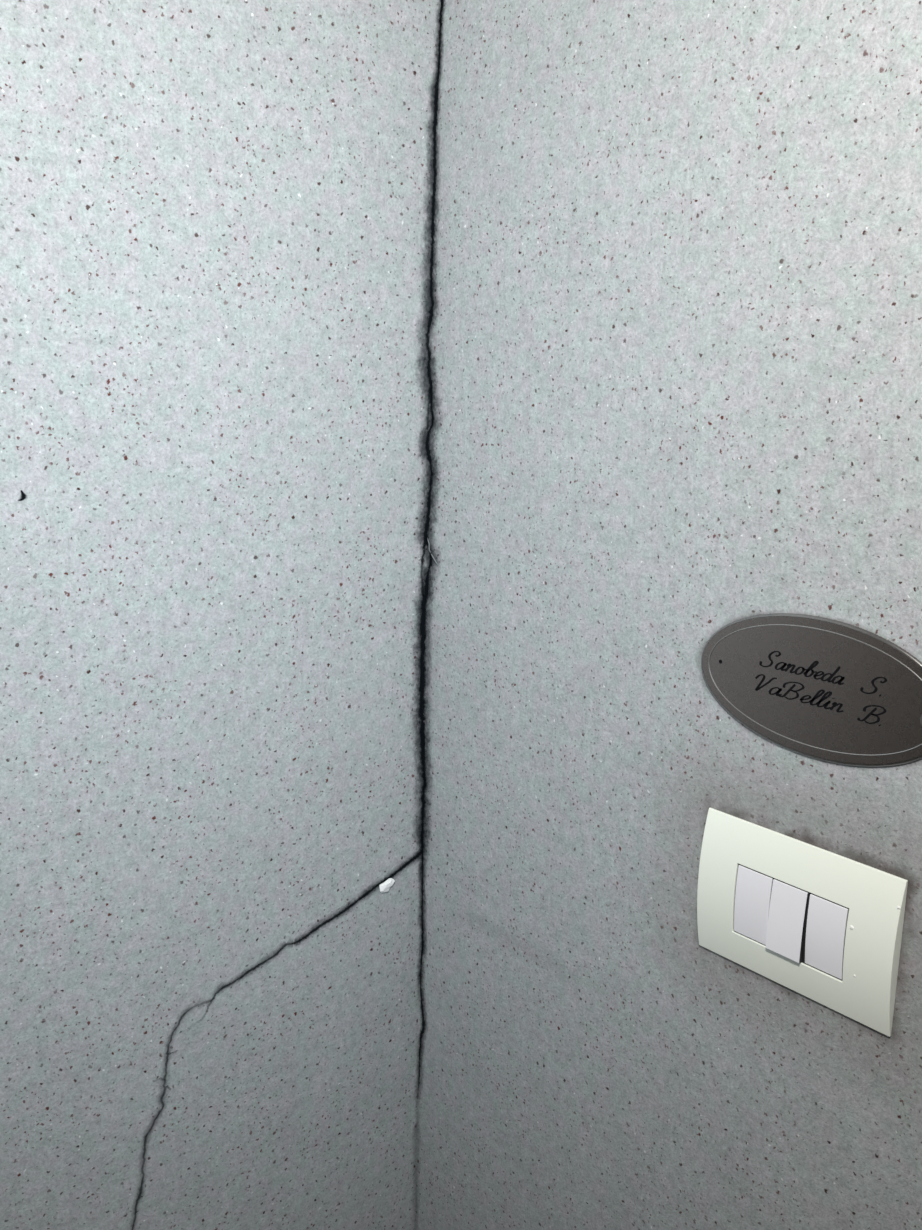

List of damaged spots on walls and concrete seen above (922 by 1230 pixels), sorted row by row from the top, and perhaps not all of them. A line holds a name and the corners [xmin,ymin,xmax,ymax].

crack [217,0,444,1086]